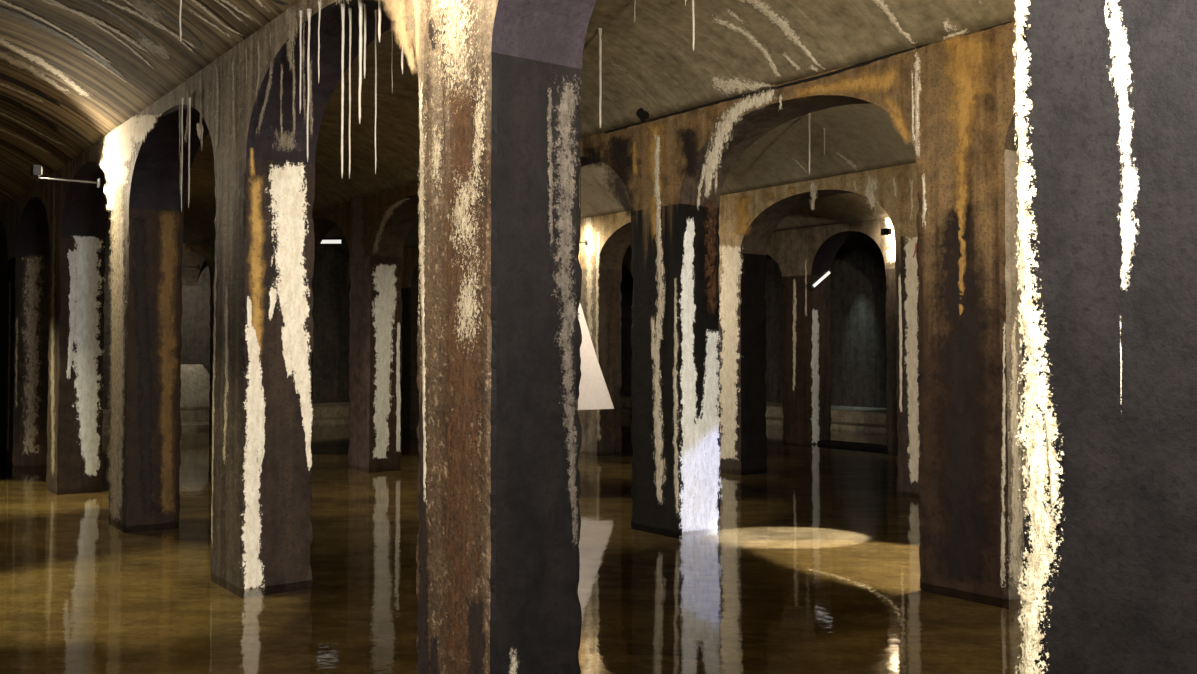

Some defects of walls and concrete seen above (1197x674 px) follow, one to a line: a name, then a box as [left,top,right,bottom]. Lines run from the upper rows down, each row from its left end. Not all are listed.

leakage [0,38,93,153]
leakage [0,0,133,87]
peeling [66,235,106,476]
leakage [43,0,313,203]
rust [249,148,263,363]
peeling [266,161,314,471]
peeling [372,263,401,461]
rust [434,80,487,674]
leakage [709,0,825,94]
rust [796,70,909,141]
rust [946,36,985,315]
peeling [1042,383,1064,542]